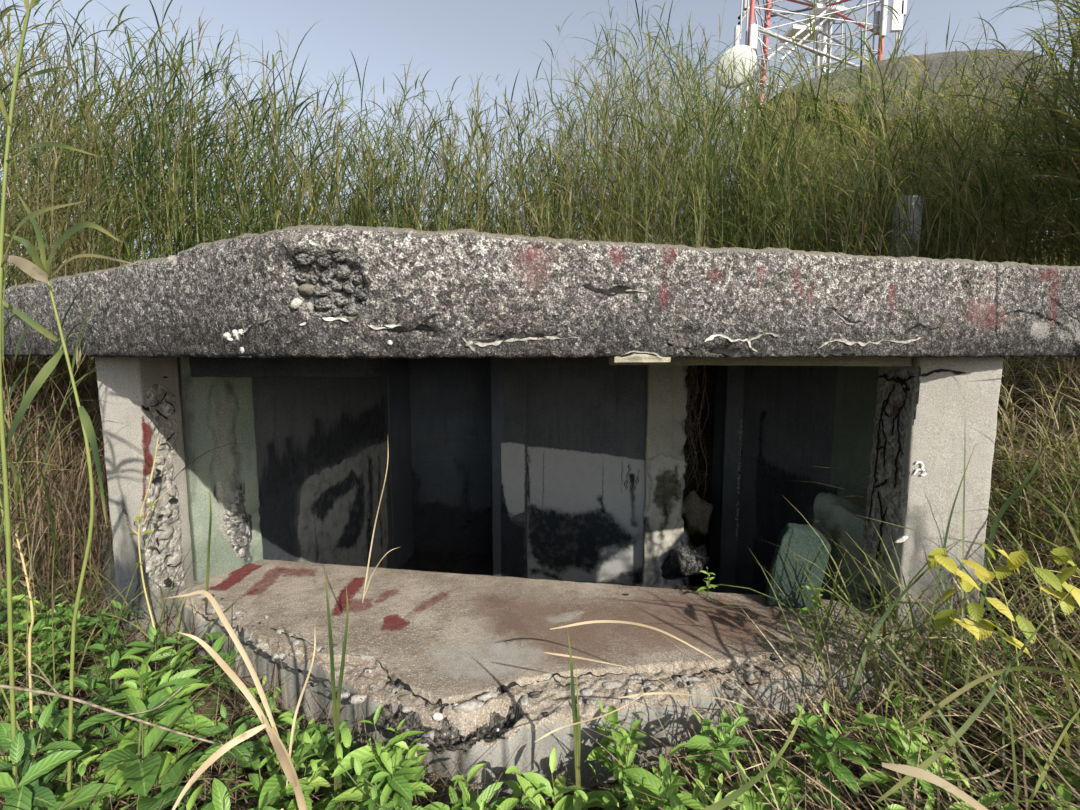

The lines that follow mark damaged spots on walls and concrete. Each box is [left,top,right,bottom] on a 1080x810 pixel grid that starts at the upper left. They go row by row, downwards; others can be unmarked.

spalling [289,250,368,325]
crack [583,284,650,296]
crack [817,307,939,357]
spalling [141,384,186,591]
spalling [221,483,251,561]
crack [868,369,966,564]
crack [189,594,818,736]